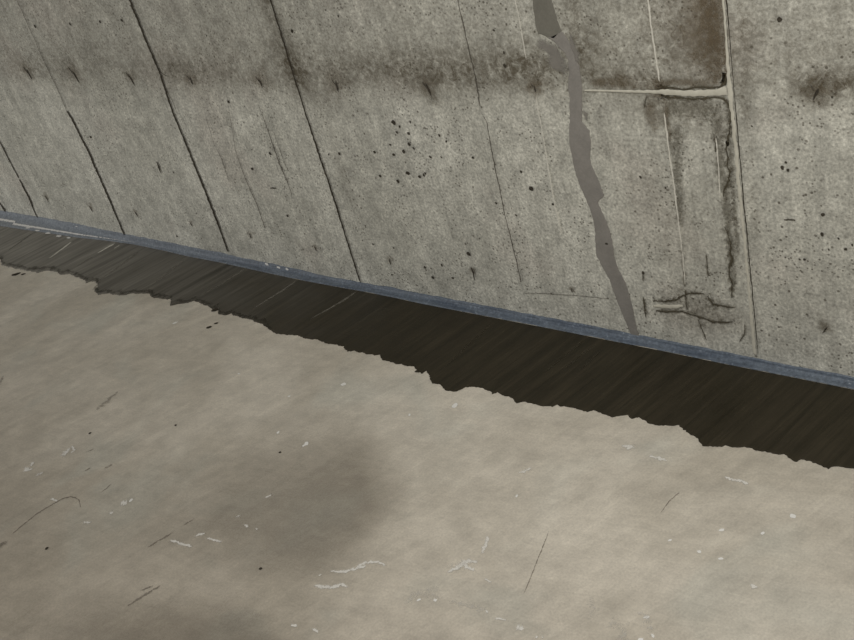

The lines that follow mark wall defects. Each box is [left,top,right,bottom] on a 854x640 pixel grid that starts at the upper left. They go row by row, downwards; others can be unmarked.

damp [647,0,731,196]
damp [643,113,735,340]